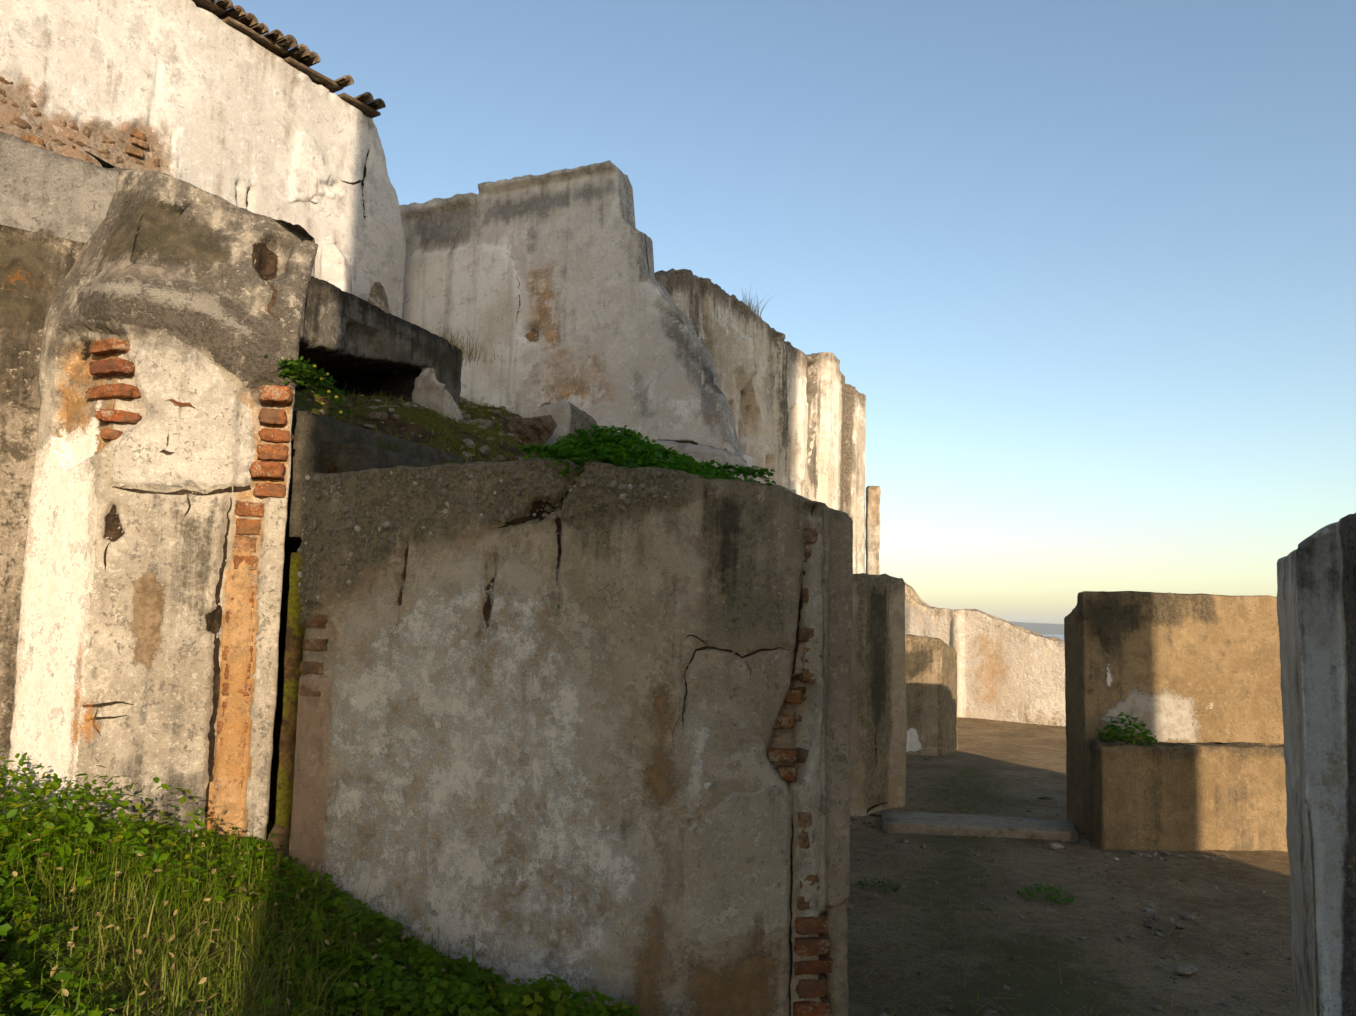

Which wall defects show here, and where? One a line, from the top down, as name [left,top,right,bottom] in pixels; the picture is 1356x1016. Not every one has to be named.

peeling [124,128,149,159]
peeling [5,333,294,846]
peeling [288,401,833,1016]
crack [672,568,805,747]
crack [787,791,795,1016]